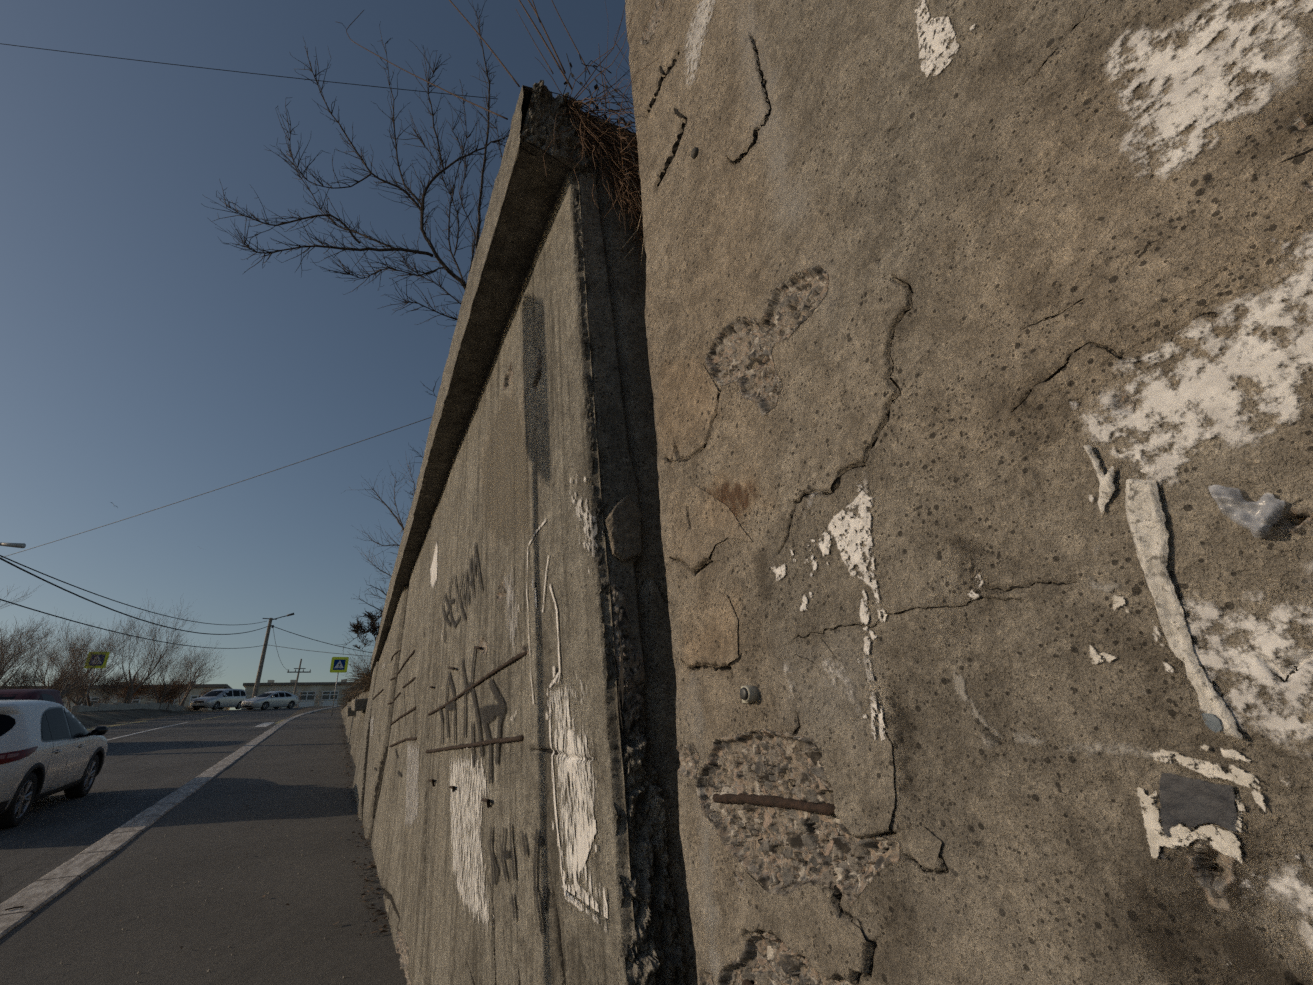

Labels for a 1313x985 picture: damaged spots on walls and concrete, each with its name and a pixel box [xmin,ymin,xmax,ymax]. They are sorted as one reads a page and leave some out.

crack [645,21,687,187]
spalling [655,266,829,461]
crack [786,278,914,540]
crack [1024,298,1084,329]
crack [1012,311,1224,412]
peeling [569,474,642,572]
spalling [667,278,946,985]
crack [793,581,1074,664]
spalling [610,580,687,985]